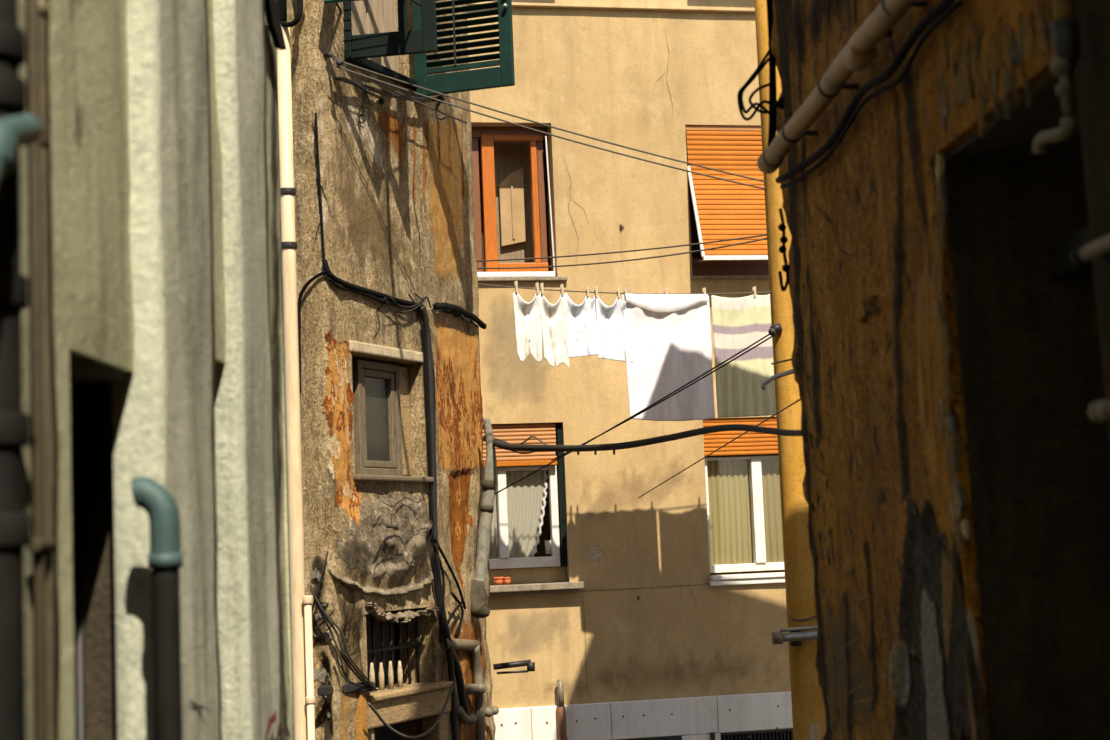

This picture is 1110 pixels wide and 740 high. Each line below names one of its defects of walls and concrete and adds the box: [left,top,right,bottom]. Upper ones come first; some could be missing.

damp [775,0,855,124]
corrosion [378,111,465,279]
crack [563,156,588,263]
damp [893,67,930,501]
peeling [322,330,362,527]
peeling [436,320,483,594]
damp [788,135,877,740]
spalling [889,151,988,740]
spalling [363,602,439,622]